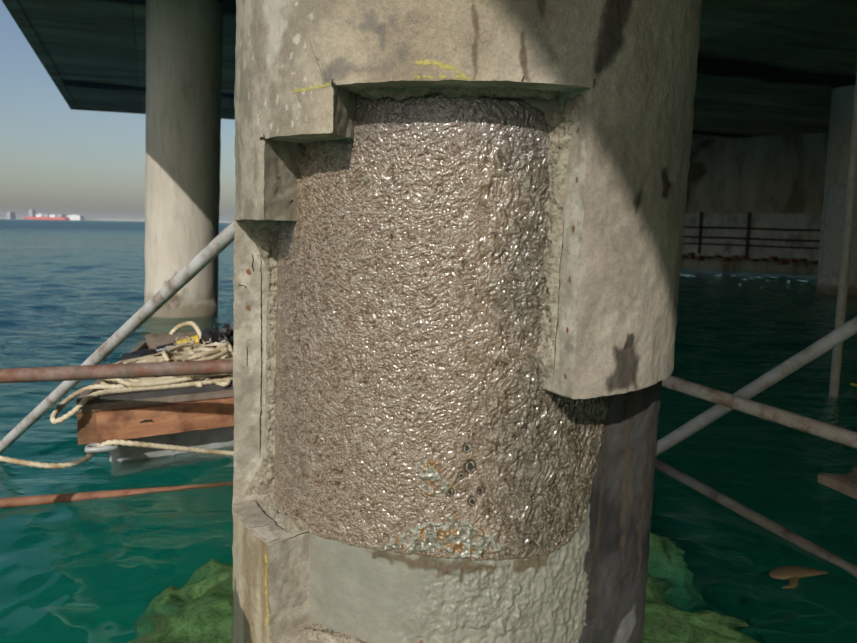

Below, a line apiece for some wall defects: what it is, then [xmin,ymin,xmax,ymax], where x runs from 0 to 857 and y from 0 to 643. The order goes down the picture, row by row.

peeling [262,0,312,75]
leakage [594,0,631,83]
peeling [257,77,320,132]
spalling [244,86,608,561]
leakage [588,334,654,619]
spalling [298,624,368,643]